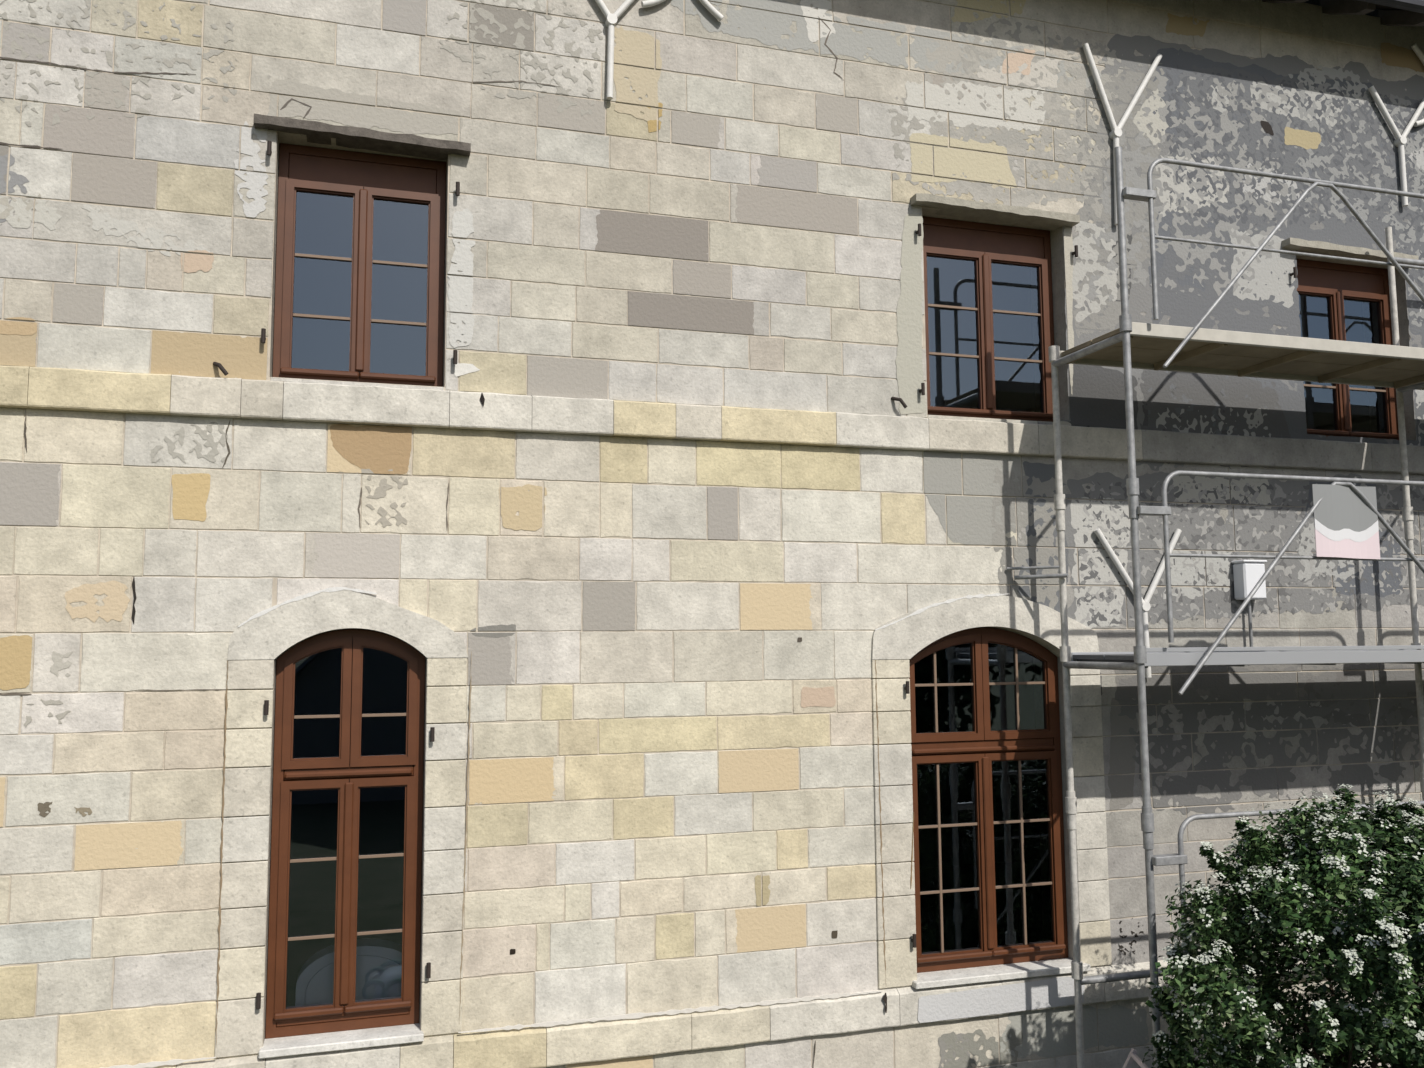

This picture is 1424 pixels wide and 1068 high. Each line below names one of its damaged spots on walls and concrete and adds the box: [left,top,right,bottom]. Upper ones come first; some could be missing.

peeling [800,0,836,42]
peeling [905,57,1062,188]
peeling [1072,65,1424,327]
spalling [148,422,228,464]
peeling [1156,406,1271,437]
peeling [1409,390,1424,446]
spalling [361,469,408,528]
peeling [1070,473,1424,628]
spalling [938,1029,1023,1068]